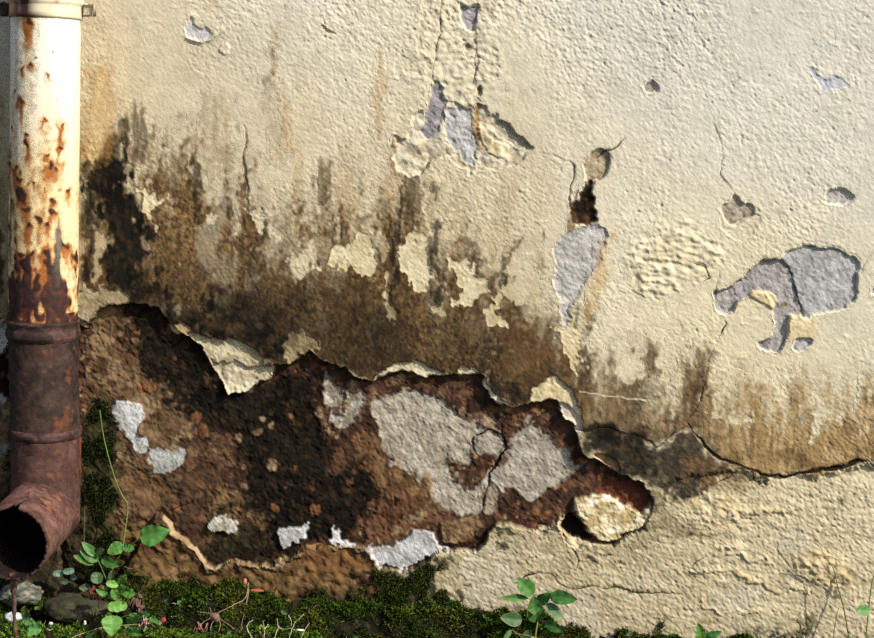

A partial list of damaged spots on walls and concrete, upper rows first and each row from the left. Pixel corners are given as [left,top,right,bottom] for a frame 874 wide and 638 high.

corrosion [7,16,79,324]
peeling [388,0,535,183]
peeling [396,226,437,294]
leakage [78,19,874,551]
peeling [549,145,620,377]
peeling [711,243,874,358]
leakage [4,536,158,600]
flaking render [78,279,647,603]
leakage [436,555,528,613]
crack [472,429,507,511]
leakage [475,526,525,563]
crack [588,322,874,492]